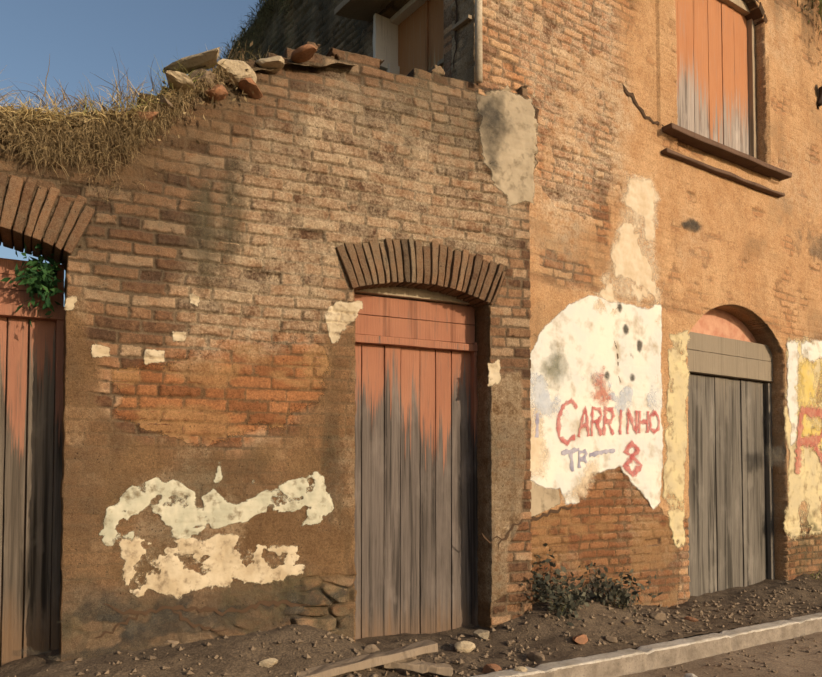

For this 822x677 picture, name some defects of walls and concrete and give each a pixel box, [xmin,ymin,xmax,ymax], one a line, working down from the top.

crack [451,0,459,67]
crack [622,83,664,126]
peeling [65,296,77,310]
peeling [91,344,110,357]
spalling [111,300,363,447]
peeling [530,295,690,607]
peeling [769,338,822,540]
peeling [99,462,334,599]